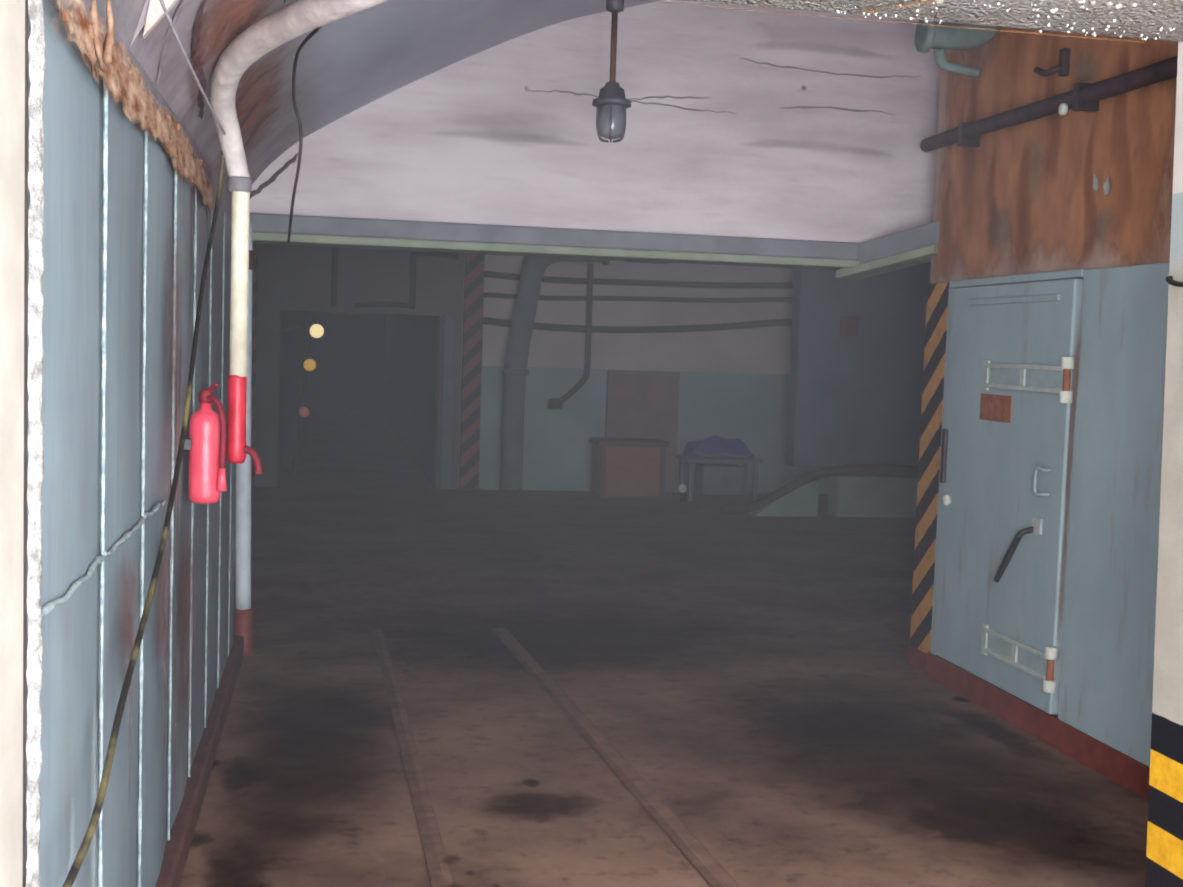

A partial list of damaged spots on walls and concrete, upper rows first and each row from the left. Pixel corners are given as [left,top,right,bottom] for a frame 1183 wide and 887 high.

peeling [89,0,115,79]
rust [58,0,215,211]
rust [202,0,264,56]
rust [235,65,279,148]
crack [526,89,599,97]
crack [628,96,735,114]
crack [740,58,921,78]
crack [781,106,894,115]
rust [697,5,1178,129]
rust [934,77,1177,280]